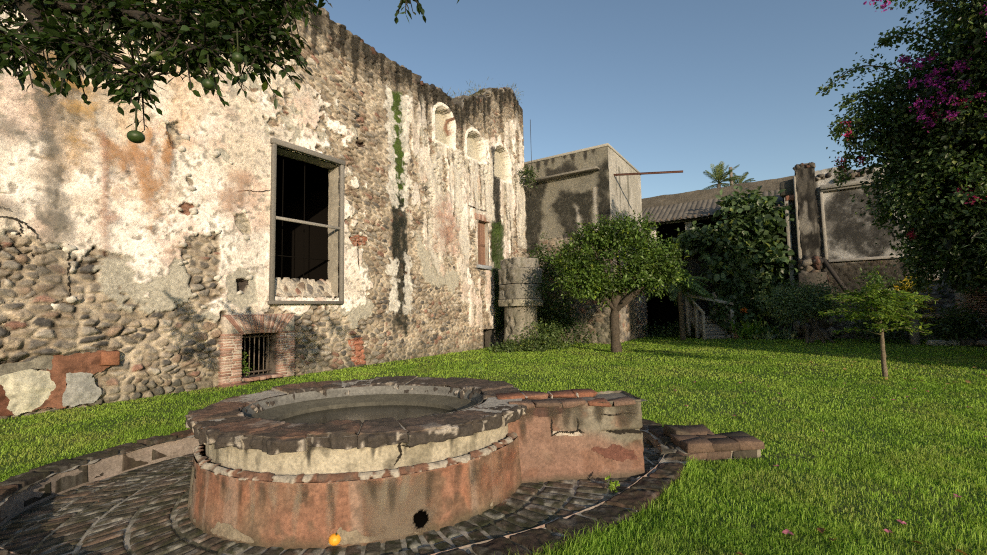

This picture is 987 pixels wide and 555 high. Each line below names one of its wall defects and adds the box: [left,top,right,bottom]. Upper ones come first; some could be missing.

crack [0,206,41,241]
flaking render [0,232,78,311]
water stain [31,51,83,251]
crack [65,244,73,297]
flaking render [177,230,222,309]
flaking render [347,232,367,246]
water stain [302,2,523,335]
water stain [427,141,611,274]
peeling [0,350,120,416]
crack [394,443,414,465]